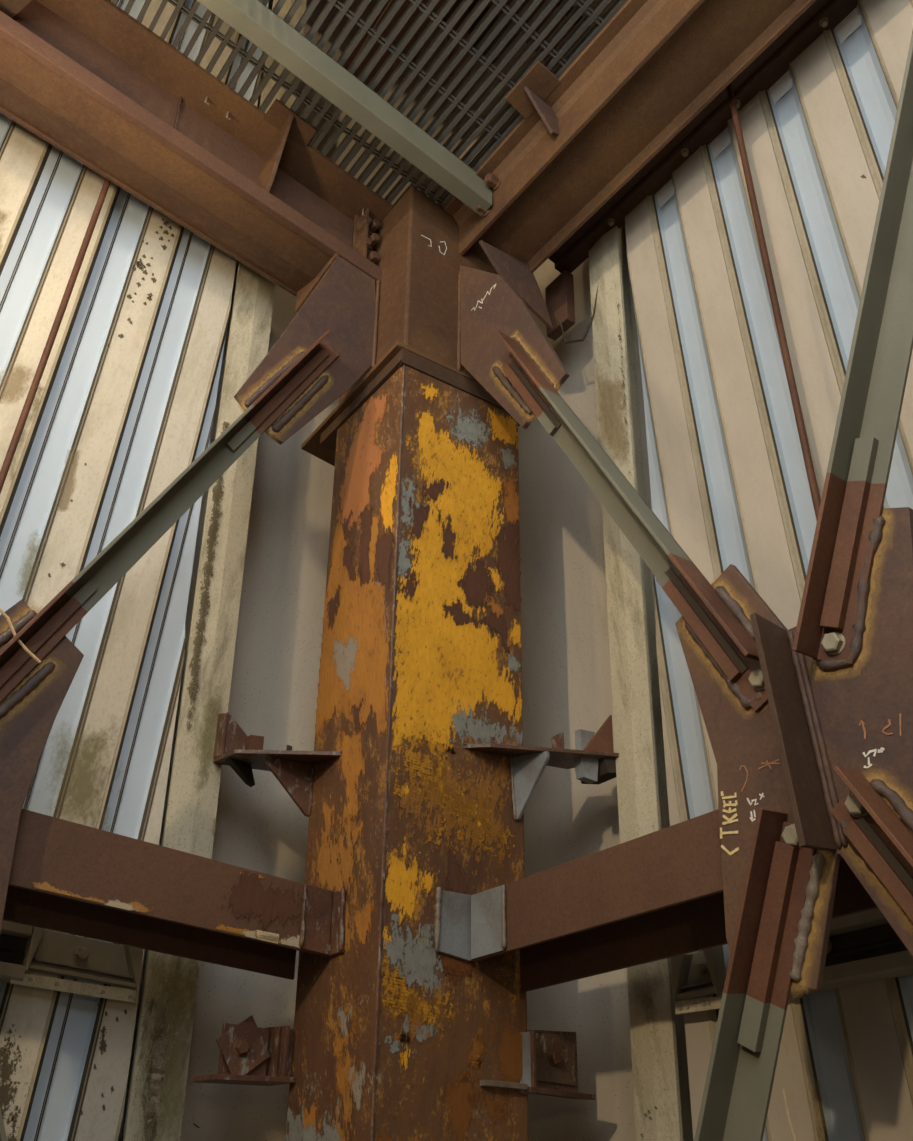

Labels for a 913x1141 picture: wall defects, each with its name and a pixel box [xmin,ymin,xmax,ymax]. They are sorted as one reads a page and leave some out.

water stain [127,218,174,306]
water stain [187,474,224,761]
rust [326,505,420,629]
rust [408,478,521,654]
rust [351,698,364,733]
peeling [286,384,523,1141]
rust [215,871,303,948]
water stain [0,1007,29,1141]